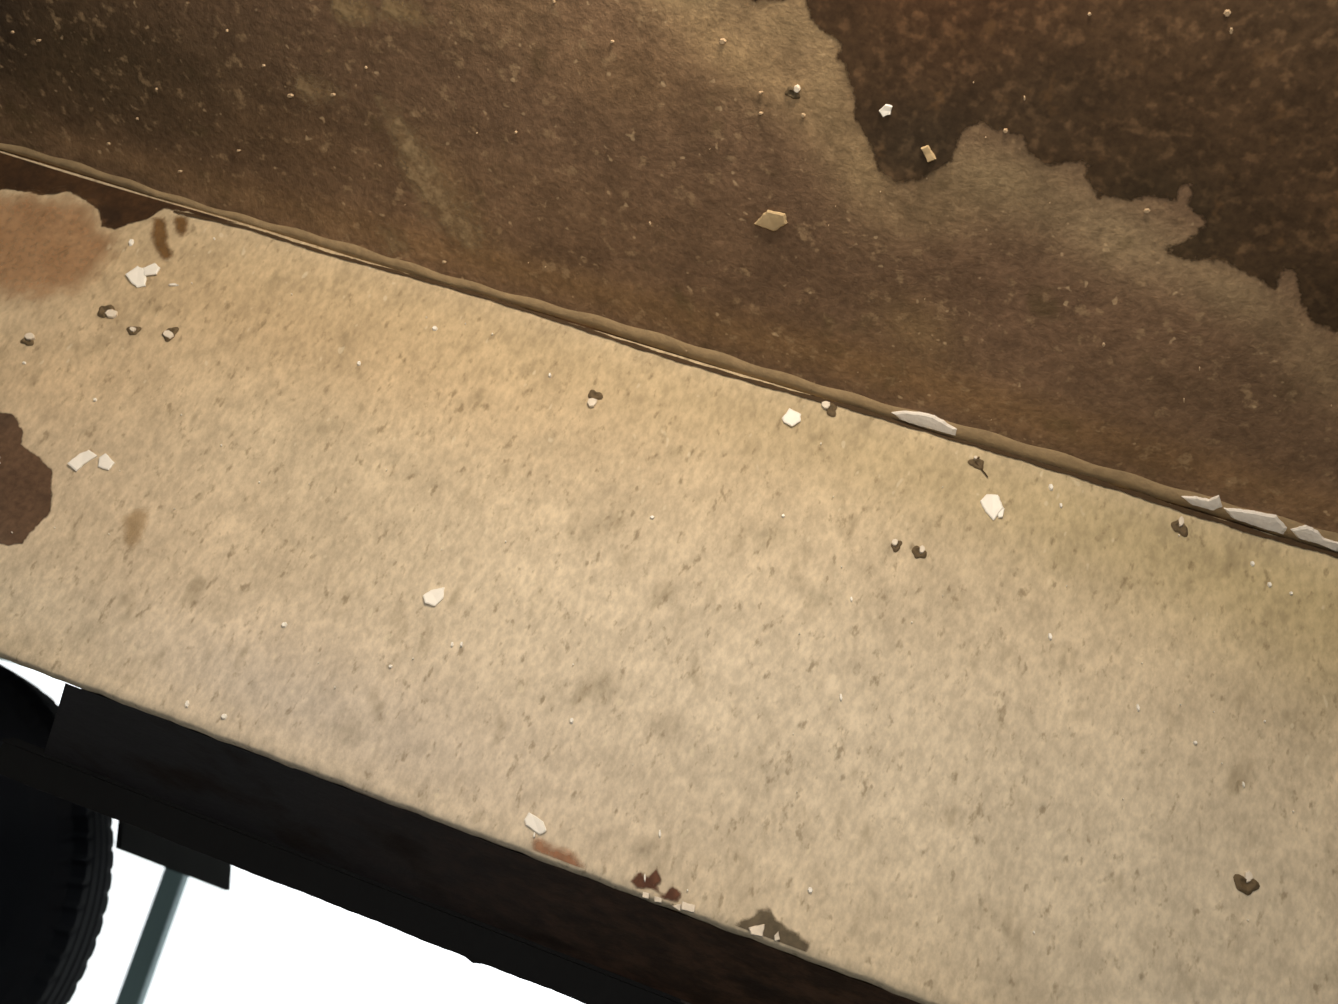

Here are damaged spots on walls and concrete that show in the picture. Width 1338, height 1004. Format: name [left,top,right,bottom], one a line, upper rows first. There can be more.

peeling [921,145,936,163]
water stain [0,152,236,259]
peeling [782,408,801,427]
peeling [980,494,1005,521]
peeling [1224,507,1338,551]
peeling [642,892,695,913]
peeling [749,924,780,942]